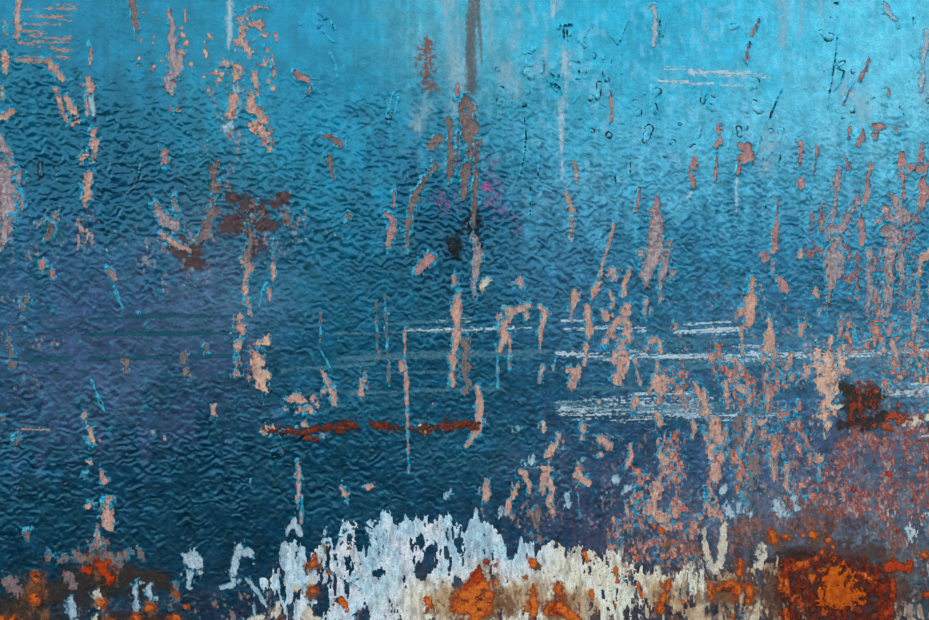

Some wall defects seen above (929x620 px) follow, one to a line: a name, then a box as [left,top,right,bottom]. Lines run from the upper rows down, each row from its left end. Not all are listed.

peeling [0,0,30,253]
peeling [37,39,103,254]
peeling [128,0,193,117]
peeling [158,145,171,172]
peeling [146,159,232,257]
peeling [202,2,316,155]
peeling [37,255,60,286]
peeling [219,80,929,620]
rust [836,378,929,432]
rust [0,551,190,620]
rust [422,557,581,620]
rust [704,511,929,620]